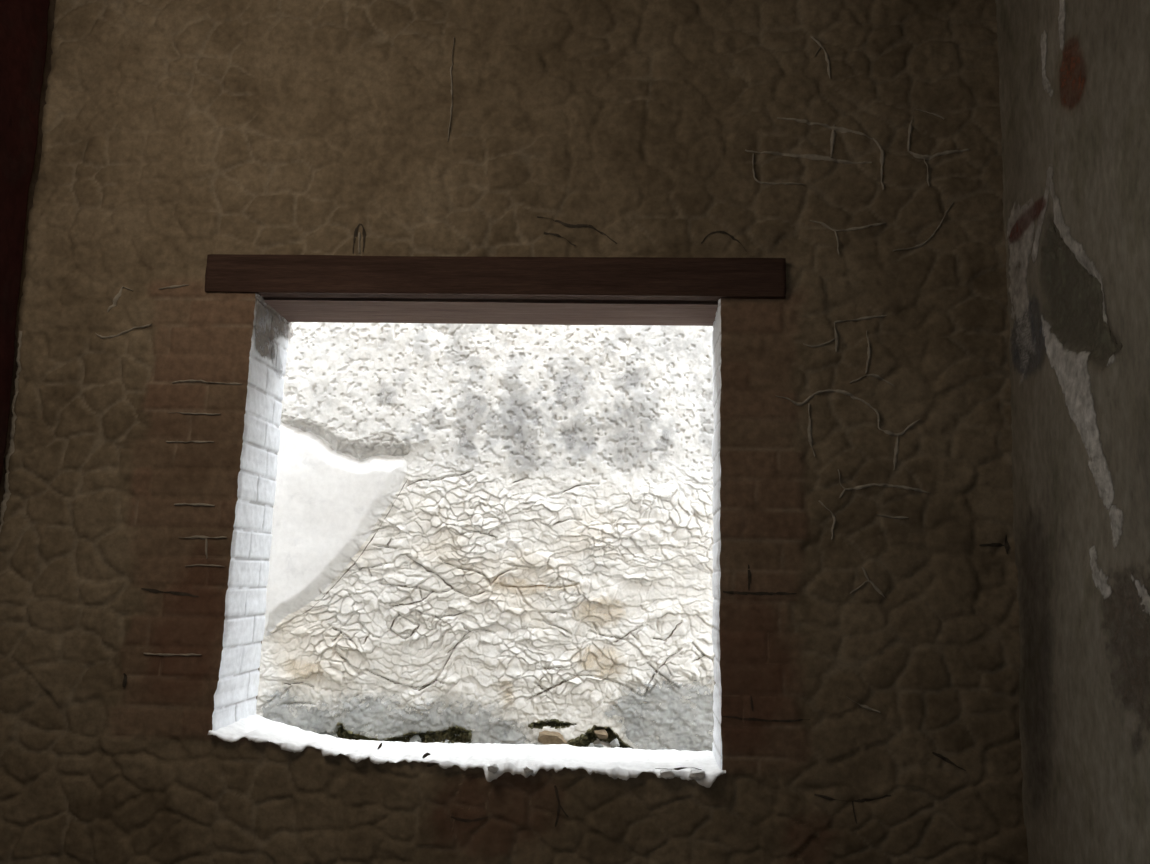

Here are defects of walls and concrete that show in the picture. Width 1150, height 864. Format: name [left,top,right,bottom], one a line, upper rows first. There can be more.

peeling [1007,167,1123,547]
crack [293,471,575,691]
crack [723,565,797,595]
peeling [1089,547,1111,598]
peeling [1131,575,1150,611]
crack [527,622,712,700]